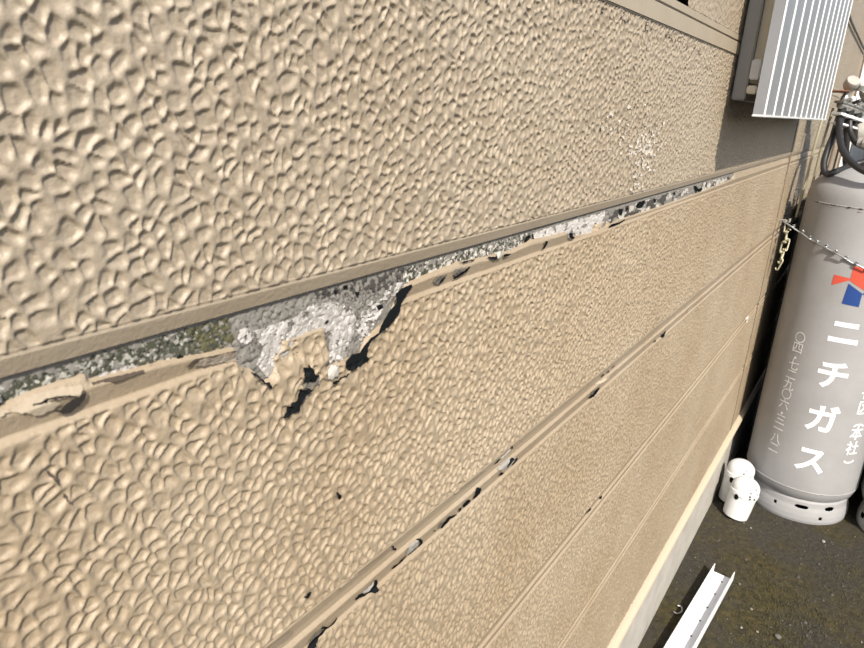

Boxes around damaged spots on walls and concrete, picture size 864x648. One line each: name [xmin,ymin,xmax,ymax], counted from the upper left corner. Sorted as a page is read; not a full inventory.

spalling [0,172,734,417]
damp [99,363,136,377]
peeling [340,550,391,591]